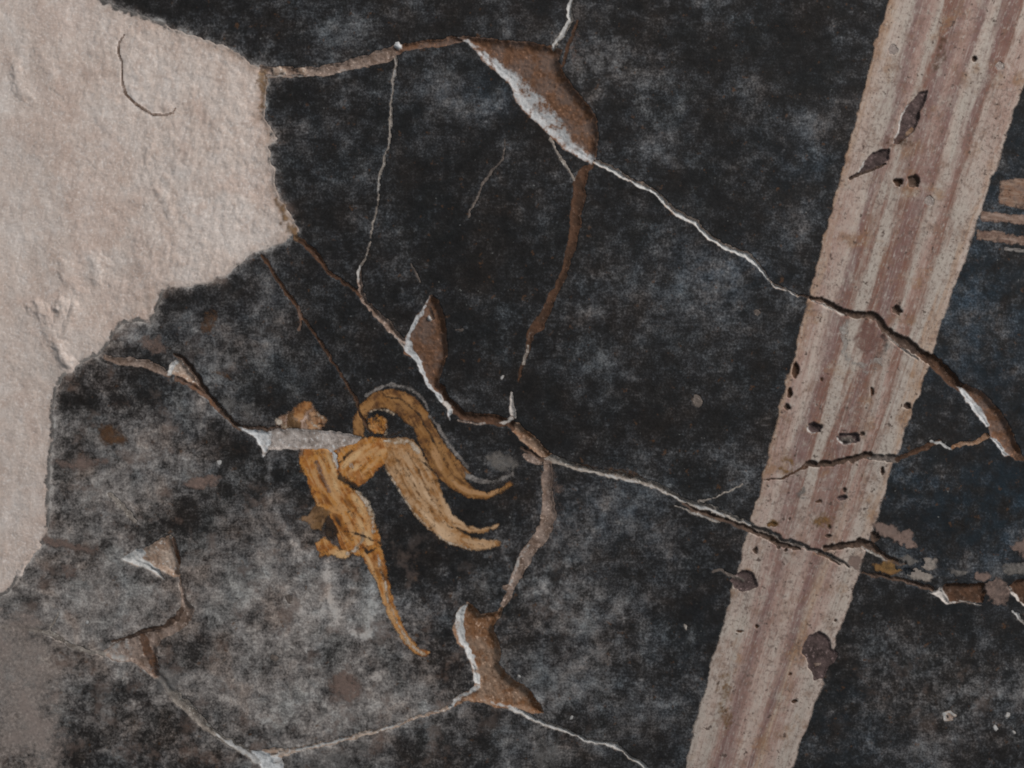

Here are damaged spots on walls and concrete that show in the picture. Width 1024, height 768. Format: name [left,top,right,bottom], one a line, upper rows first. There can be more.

crack [117,34,176,116]
spalling [458,37,599,181]
crack [259,36,480,348]
flaking render [0,0,299,768]
crack [103,353,281,432]
spalling [404,295,464,420]
crack [439,160,990,607]
spalling [955,384,1024,461]
spalling [848,522,1024,624]
spalling [450,602,544,714]
crack [158,673,452,765]
crack [508,708,649,768]